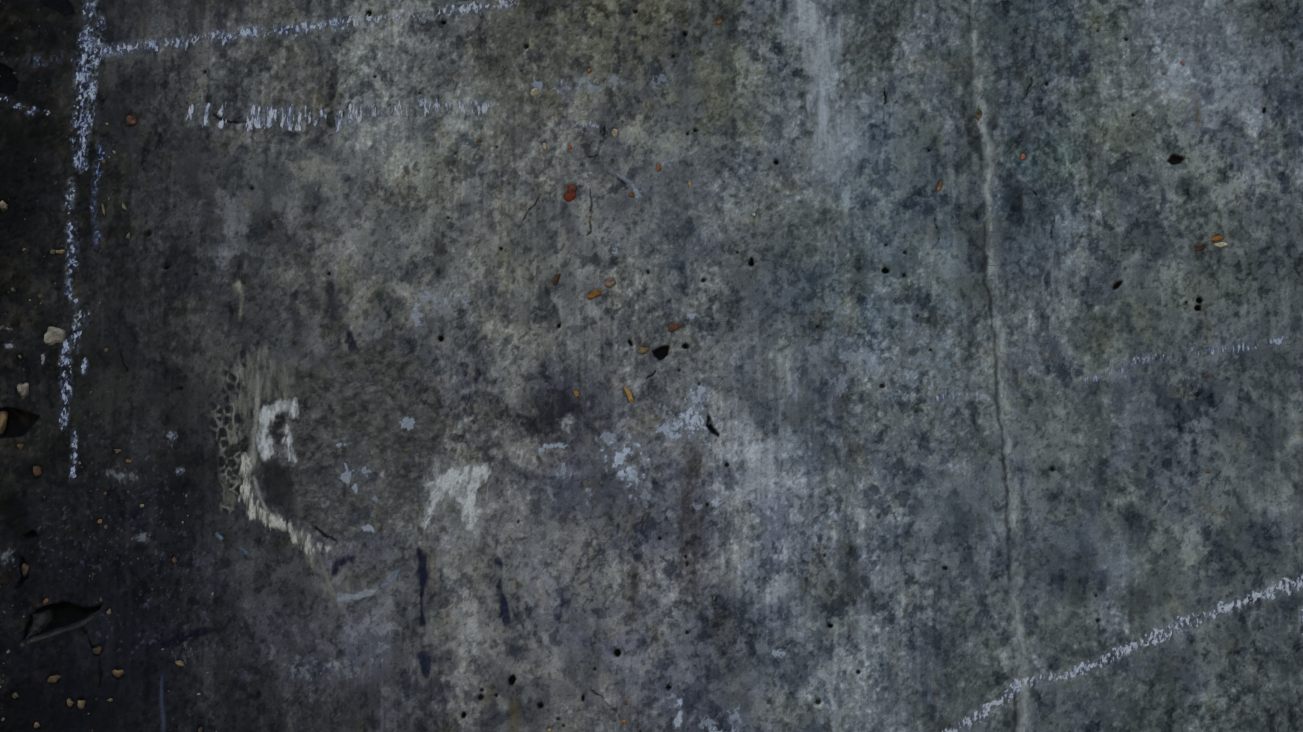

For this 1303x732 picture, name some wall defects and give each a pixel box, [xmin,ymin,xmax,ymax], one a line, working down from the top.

spalling [215,343,491,602]
hole [24,602,101,643]